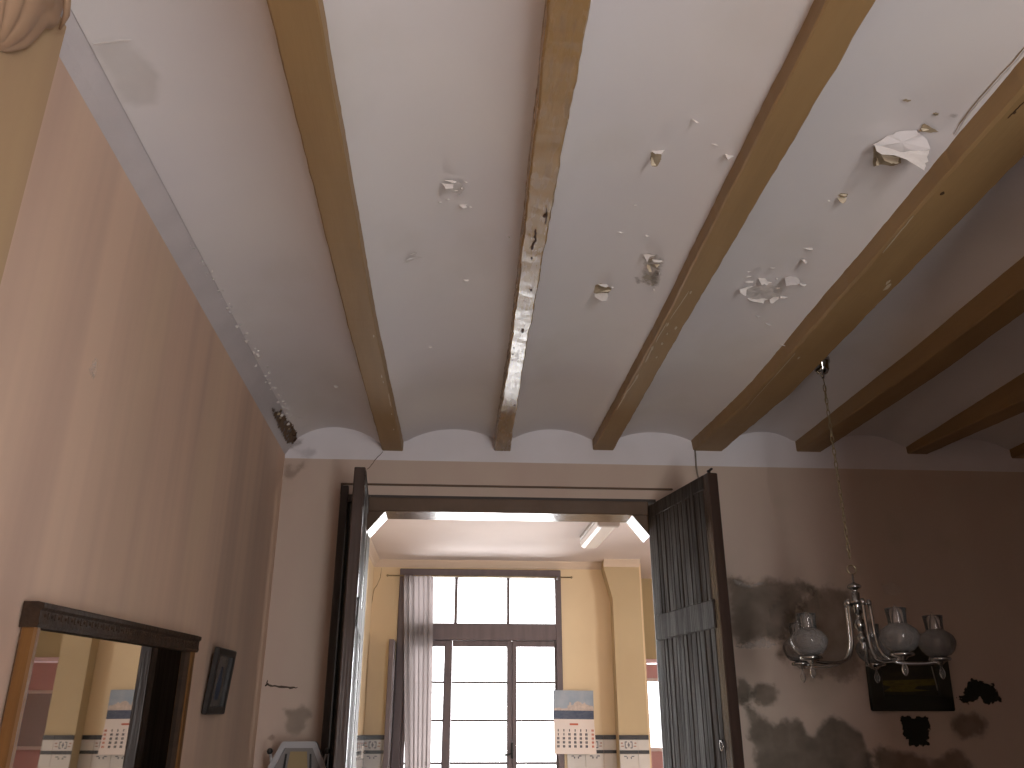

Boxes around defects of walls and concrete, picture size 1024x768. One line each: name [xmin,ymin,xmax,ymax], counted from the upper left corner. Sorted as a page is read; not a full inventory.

peeling [650,150,664,167]
peeling [873,124,938,171]
peeling [594,283,614,301]
peeling [643,254,662,291]
peeling [740,268,807,304]
damp [272,406,297,444]
damp [738,685,969,768]